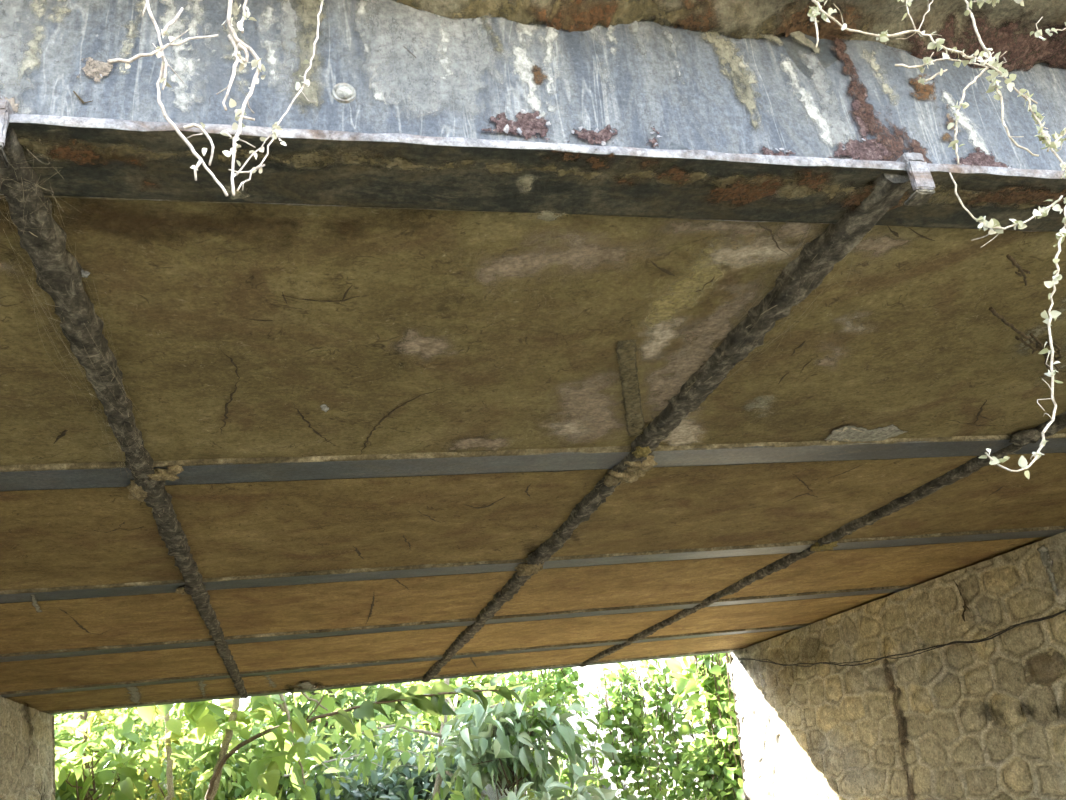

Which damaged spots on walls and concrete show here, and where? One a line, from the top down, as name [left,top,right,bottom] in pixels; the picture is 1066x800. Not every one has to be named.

corrosion [906,11,1066,73]
corrosion [770,0,933,164]
crack [220,350,240,432]
crack [293,403,332,444]
crack [361,388,444,454]
flaking render [824,424,907,442]